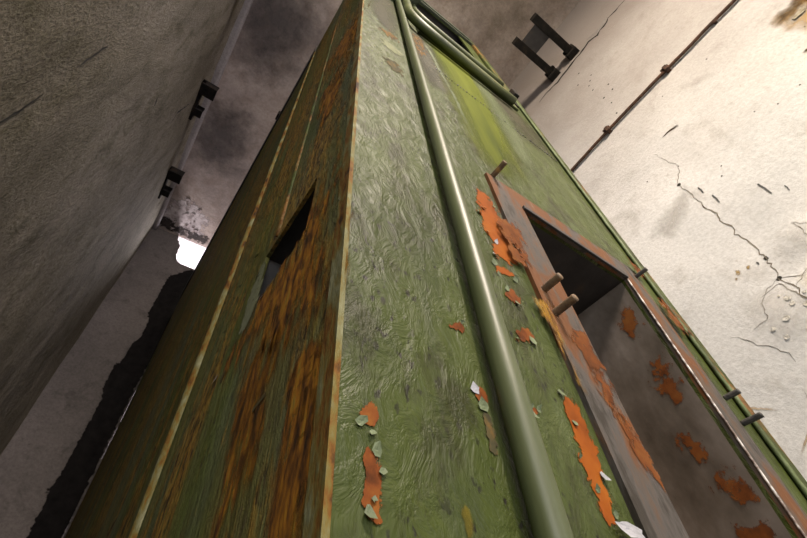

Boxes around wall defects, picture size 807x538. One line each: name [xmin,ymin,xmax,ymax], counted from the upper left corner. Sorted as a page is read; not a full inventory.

rust [778,0,807,26]
crack [654,154,807,358]